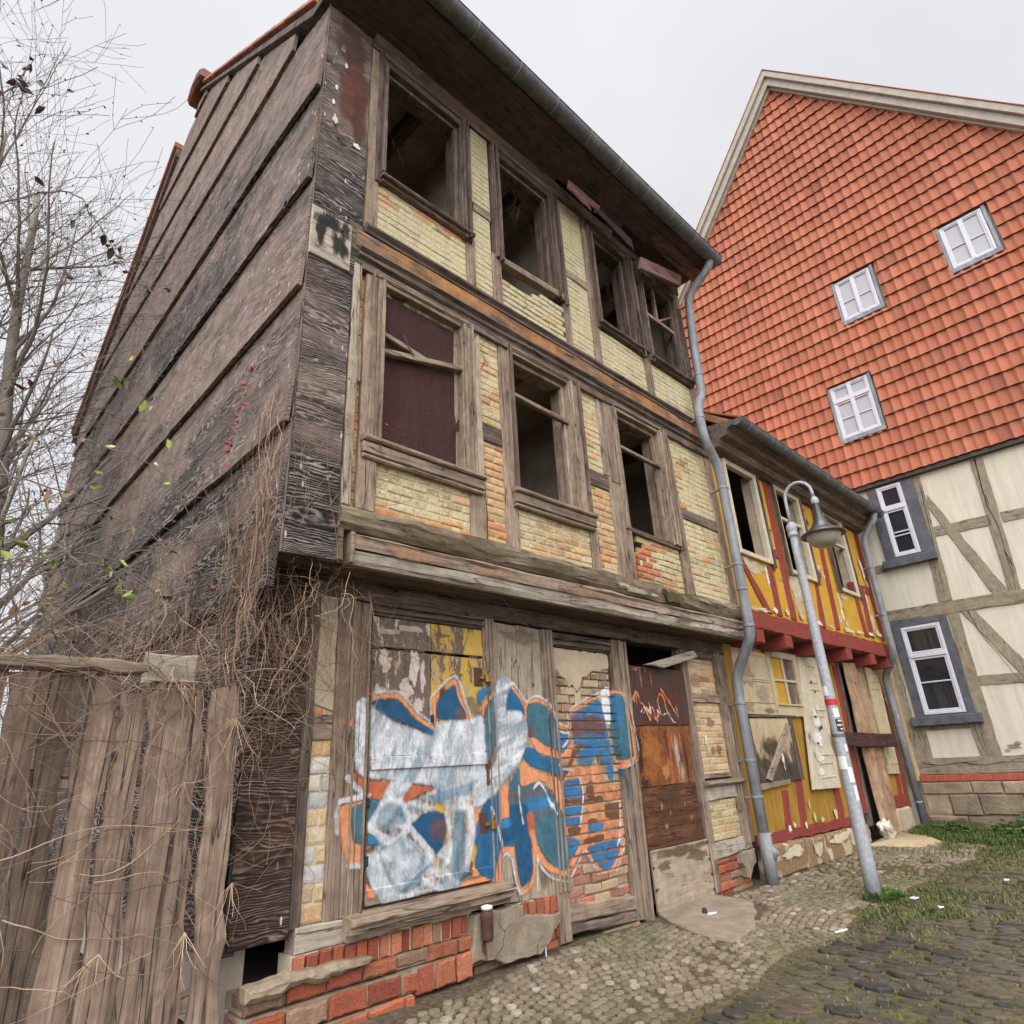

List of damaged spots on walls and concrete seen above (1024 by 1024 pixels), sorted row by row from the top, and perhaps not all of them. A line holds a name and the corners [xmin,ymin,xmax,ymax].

peeling [377,625,450,638]
peeling [375,648,392,694]
peeling [399,651,426,714]
spalling [553,648,608,707]
peeling [809,680,825,776]
flaking render [781,799,856,860]